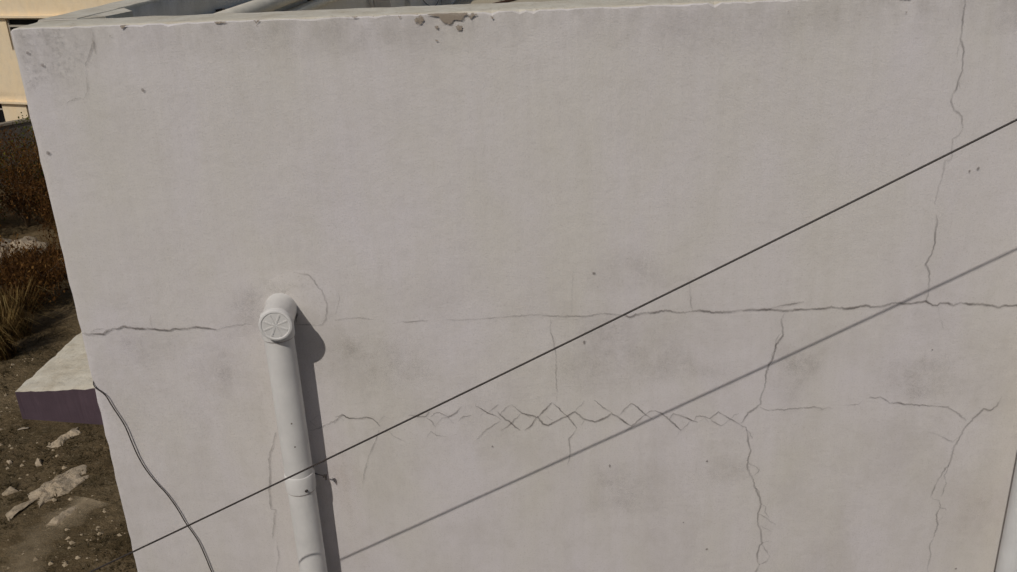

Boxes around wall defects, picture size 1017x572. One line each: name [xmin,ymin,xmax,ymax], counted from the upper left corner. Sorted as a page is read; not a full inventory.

peeling [415,12,477,41]